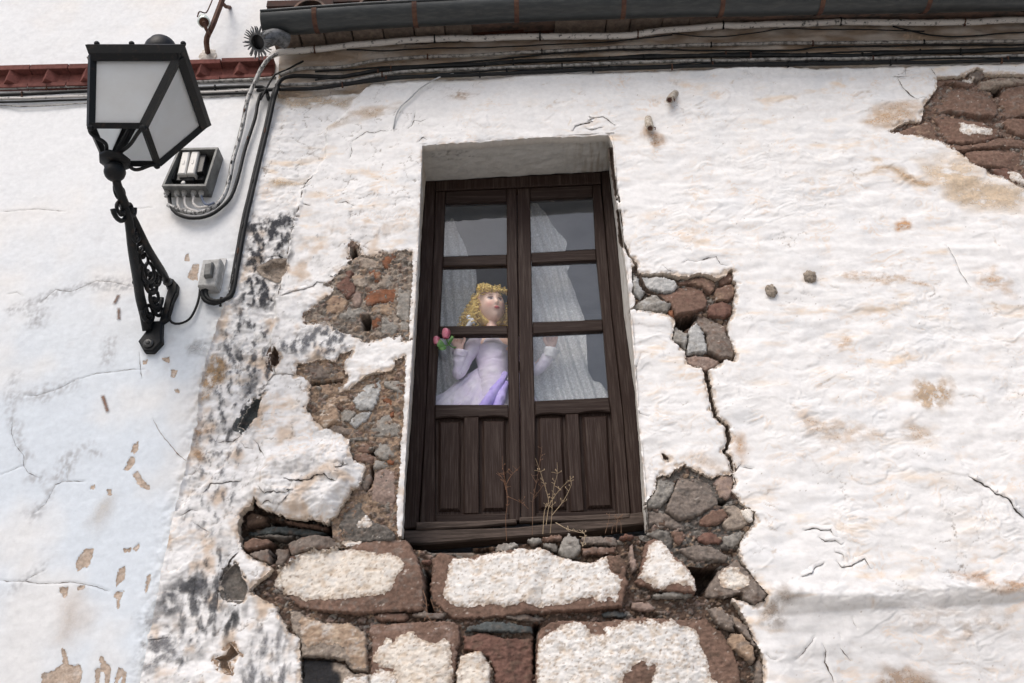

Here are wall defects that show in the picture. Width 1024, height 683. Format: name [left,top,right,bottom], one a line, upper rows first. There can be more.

crack [570,114,665,301]
water stain [895,165,1020,206]
spalling [892,70,1024,189]
water stain [194,212,345,502]
spalling [217,234,767,683]
crack [705,370,752,483]
crack [801,523,874,577]
crack [969,474,1024,518]
peeling [41,648,127,683]
water stain [243,627,285,683]